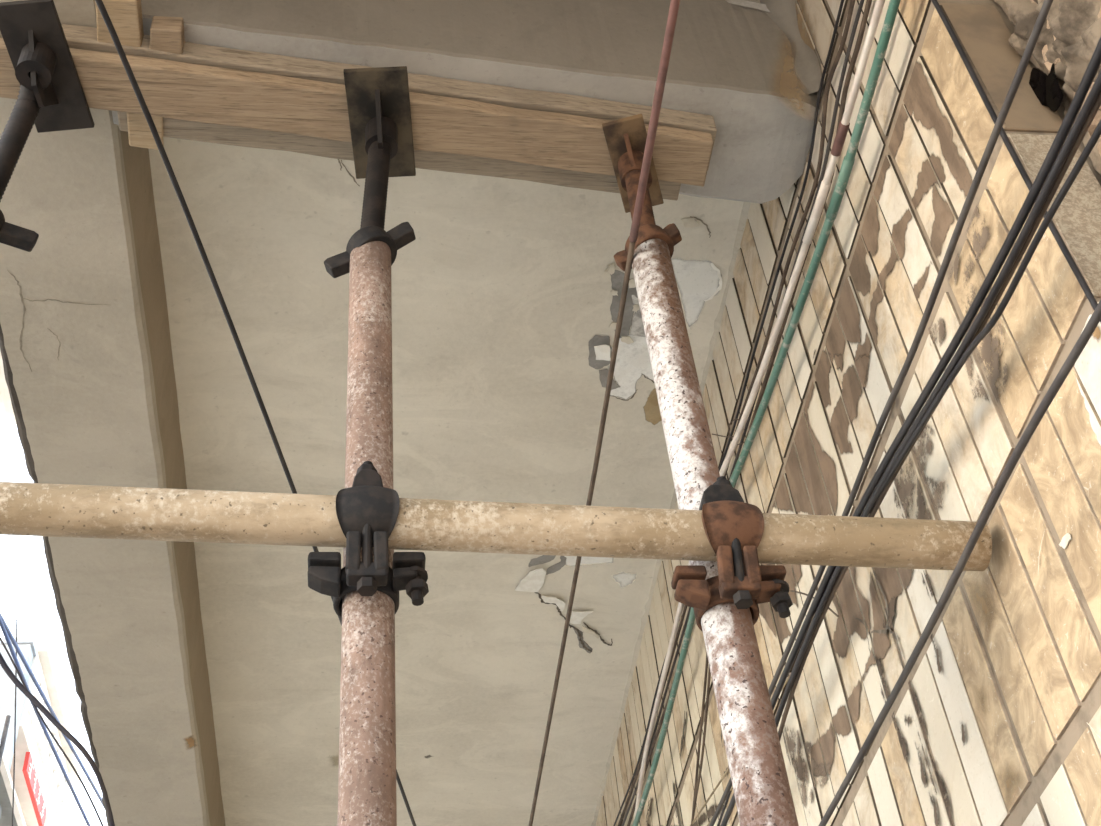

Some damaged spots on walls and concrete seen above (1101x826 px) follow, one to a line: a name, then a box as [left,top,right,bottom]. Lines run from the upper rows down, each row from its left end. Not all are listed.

damp [795,0,817,56]
crack [8,271,108,372]
flaking render [588,263,662,425]
damp [772,61,972,520]
damp [954,206,1007,401]
flaking render [515,555,636,653]
damp [758,602,791,644]
damp [762,563,802,607]
damp [783,566,953,826]